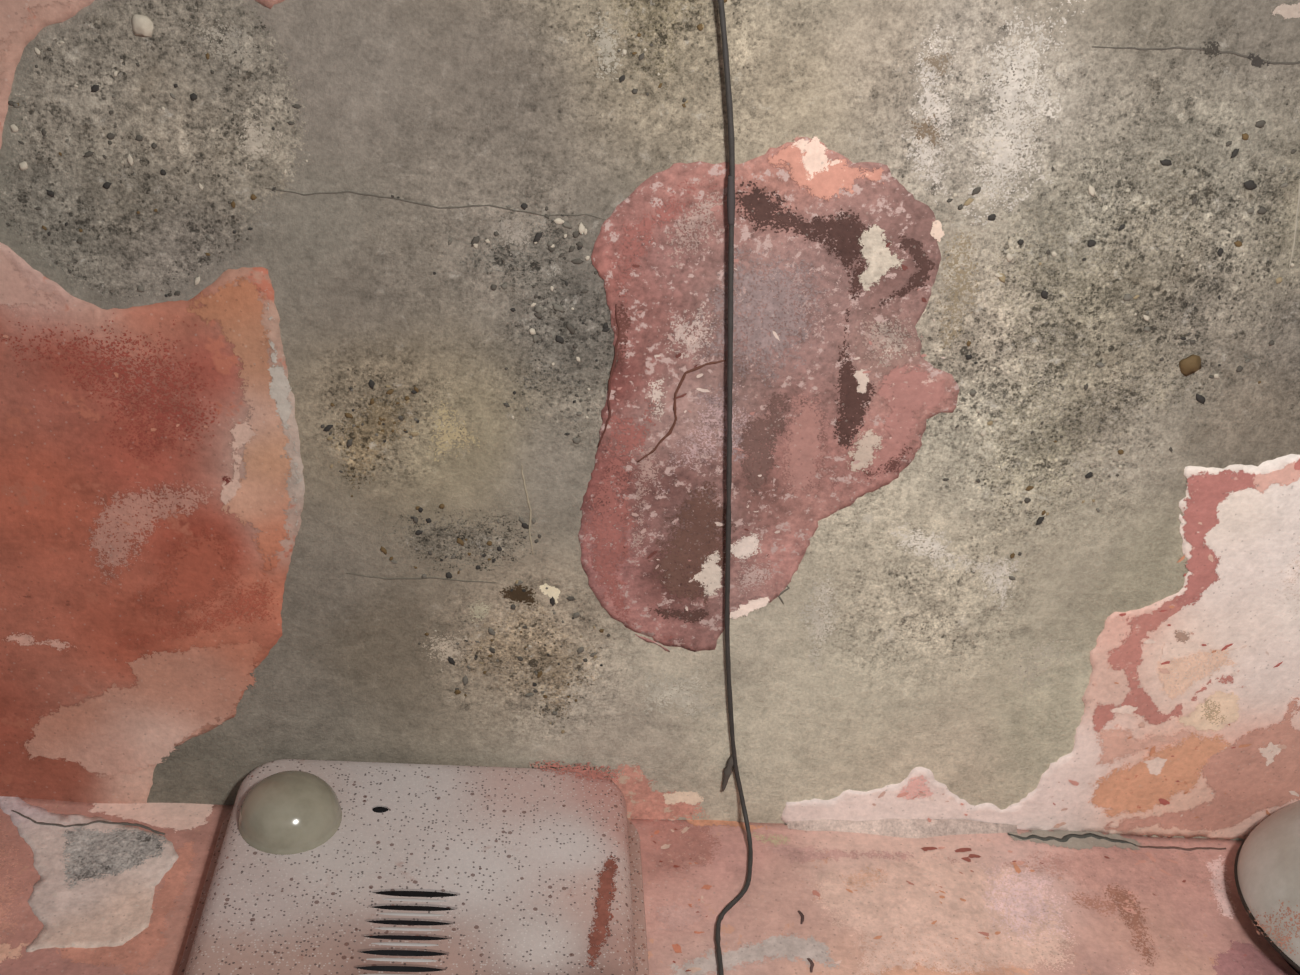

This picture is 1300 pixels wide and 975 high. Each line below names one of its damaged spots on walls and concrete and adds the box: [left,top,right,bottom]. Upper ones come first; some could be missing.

spalling [587,0,706,107]
crack [1092,41,1300,68]
crack [266,185,606,220]
peeling [0,0,310,963]
spalling [321,379,420,497]
peeling [380,120,1300,734]
peeling [612,454,1300,948]
crack [1007,830,1226,851]